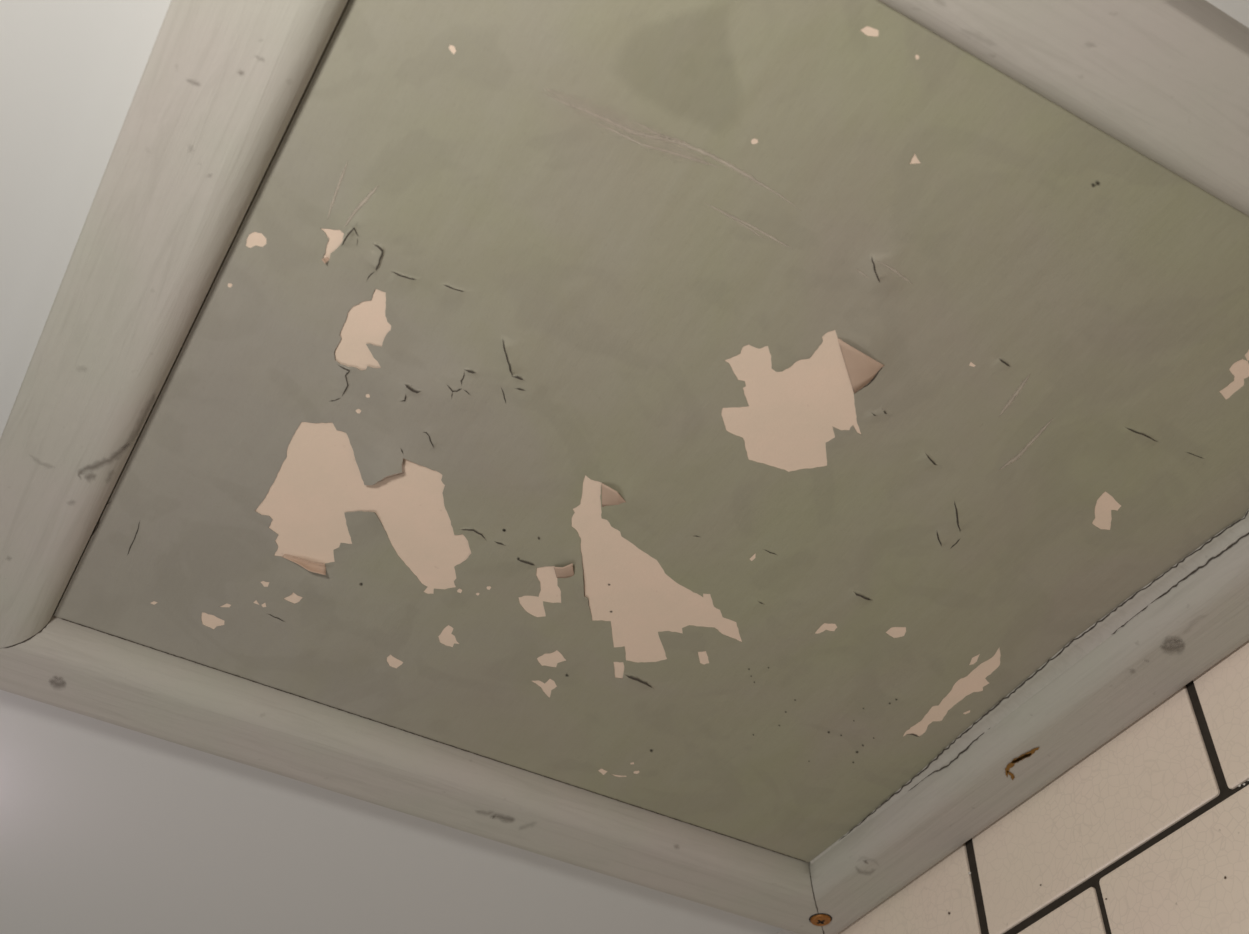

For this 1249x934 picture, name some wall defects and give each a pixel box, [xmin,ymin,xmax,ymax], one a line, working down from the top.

peeling [321,228,344,264]
crack [342,228,415,280]
peeling [334,289,391,370]
crack [403,370,475,401]
crack [501,342,525,402]
peeling [721,330,884,472]
peeling [1219,350,1249,400]
peeling [255,422,491,595]
peeling [1092,491,1121,530]
peeling [518,475,742,679]
peeling [903,648,1001,737]
corrosion [1005,747,1039,780]